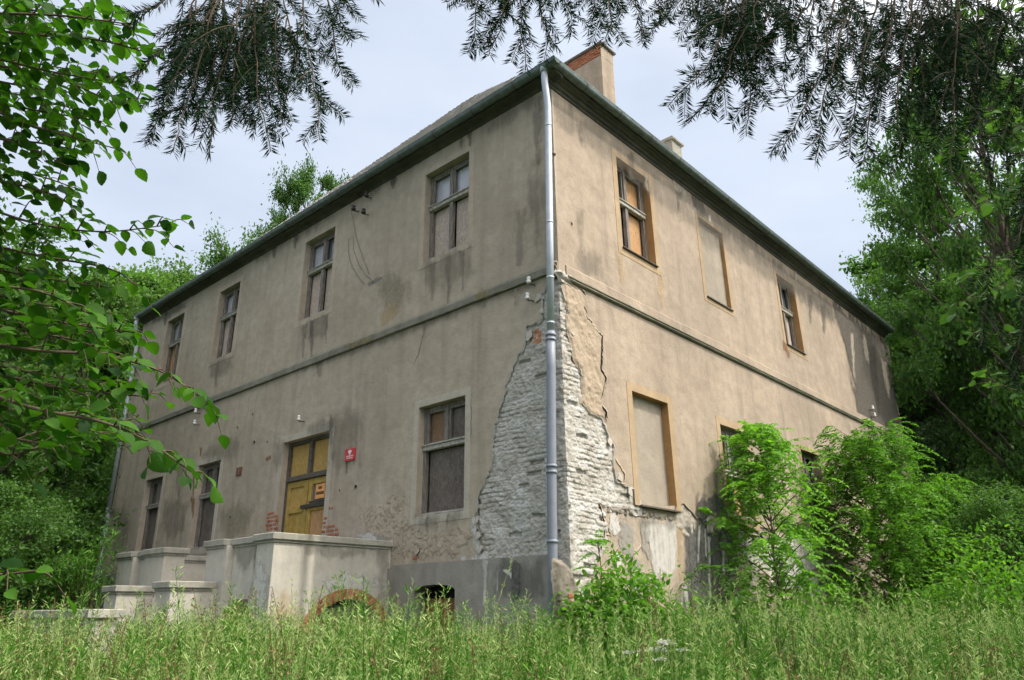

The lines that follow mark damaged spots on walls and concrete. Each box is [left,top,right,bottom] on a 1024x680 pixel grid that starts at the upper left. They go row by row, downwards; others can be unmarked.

crack [564,281,608,420]
flaking render [359,261,725,635]
flaking render [265,512,279,531]
flaking render [322,505,339,536]